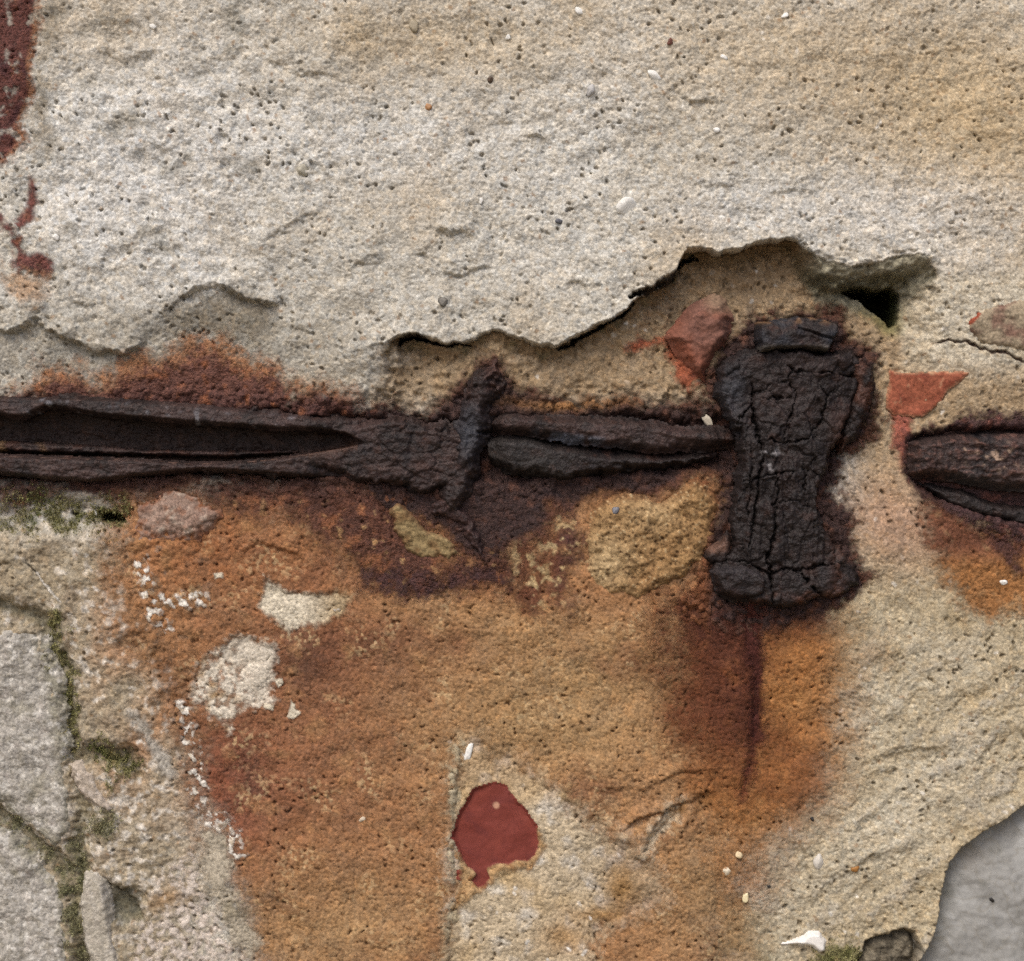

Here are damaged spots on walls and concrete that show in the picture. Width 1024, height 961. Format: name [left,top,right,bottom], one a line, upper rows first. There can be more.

spalling [385,240,936,363]
peeling [835,358,876,454]
corrosion [897,409,1024,618]
corrosion [0,391,885,961]
peeling [441,730,684,961]